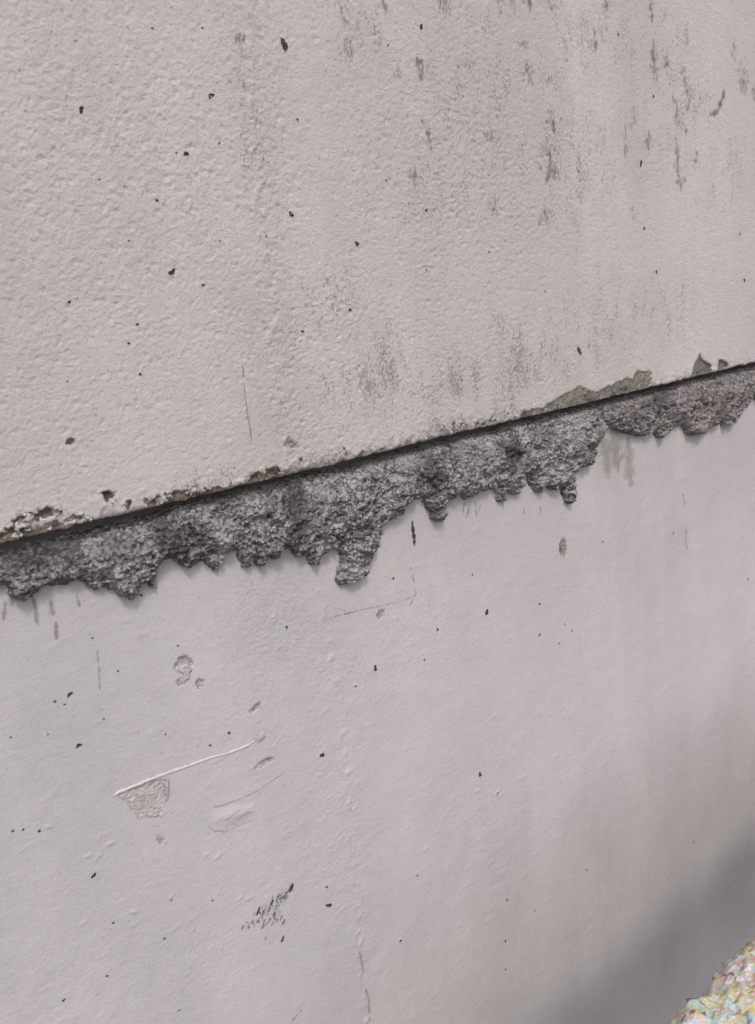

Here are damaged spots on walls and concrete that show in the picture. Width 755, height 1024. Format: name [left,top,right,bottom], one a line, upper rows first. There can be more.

peeling [691,355,729,377]
peeling [442,370,652,435]
spalling [102,466,289,509]
spalling [0,503,93,539]
crack [409,521,417,545]
peeling [559,538,567,557]